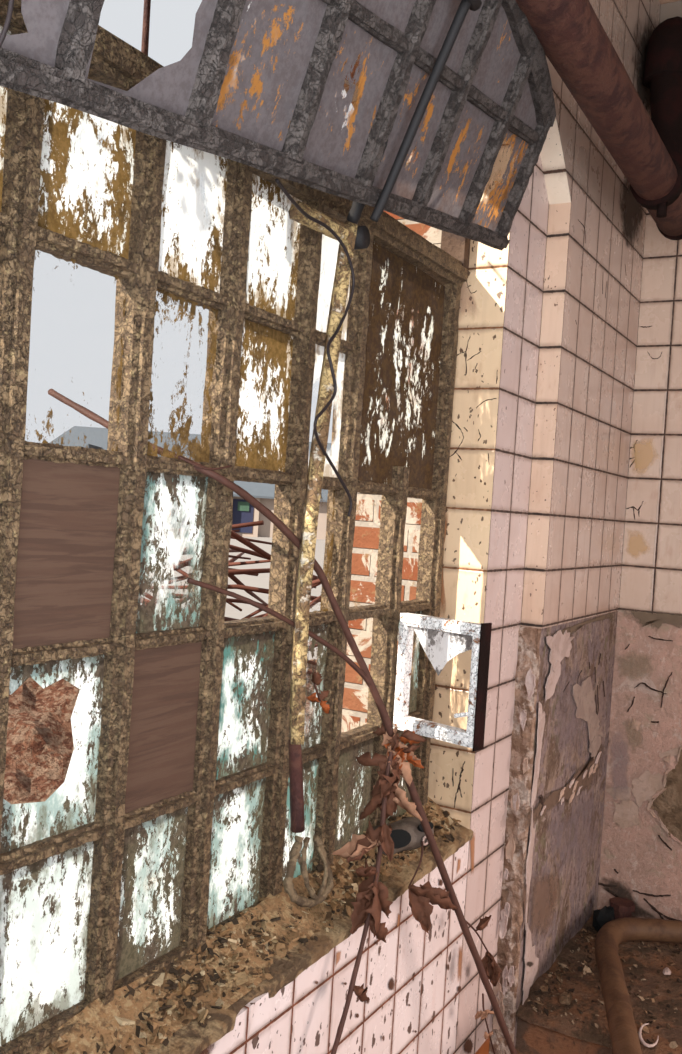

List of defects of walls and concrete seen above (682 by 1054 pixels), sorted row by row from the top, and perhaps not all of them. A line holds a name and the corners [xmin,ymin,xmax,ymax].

leakage [632,18,654,113]
spalling [489,627,609,1054]
flaking render [606,747,682,846]